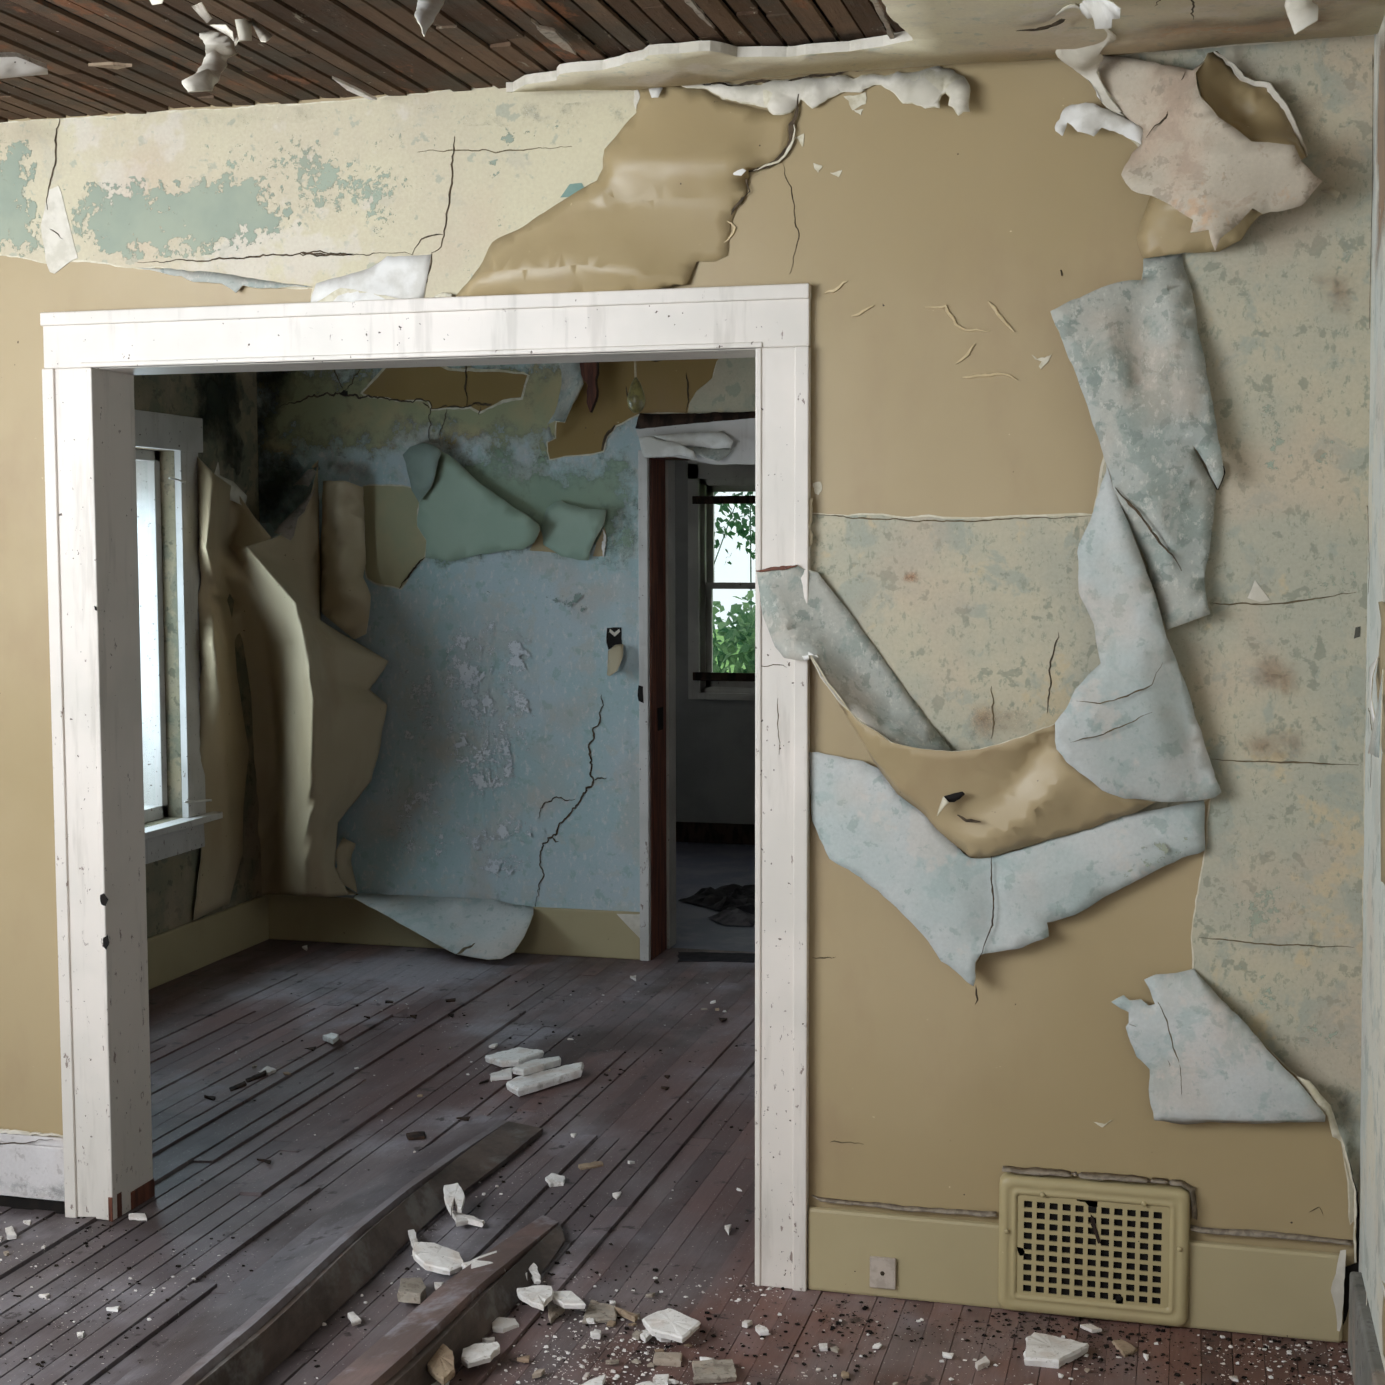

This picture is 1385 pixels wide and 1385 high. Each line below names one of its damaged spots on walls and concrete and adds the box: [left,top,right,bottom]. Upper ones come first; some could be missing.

crack [137,137,572,283]
peeling [0,0,1385,302]
leakage [198,371,303,521]
peeling [257,364,635,548]
peeling [688,358,755,413]
peeling [810,456,1111,751]
peeling [1113,35,1374,1225]
crack [535,699,606,907]
flaking render [0,1129,63,1137]